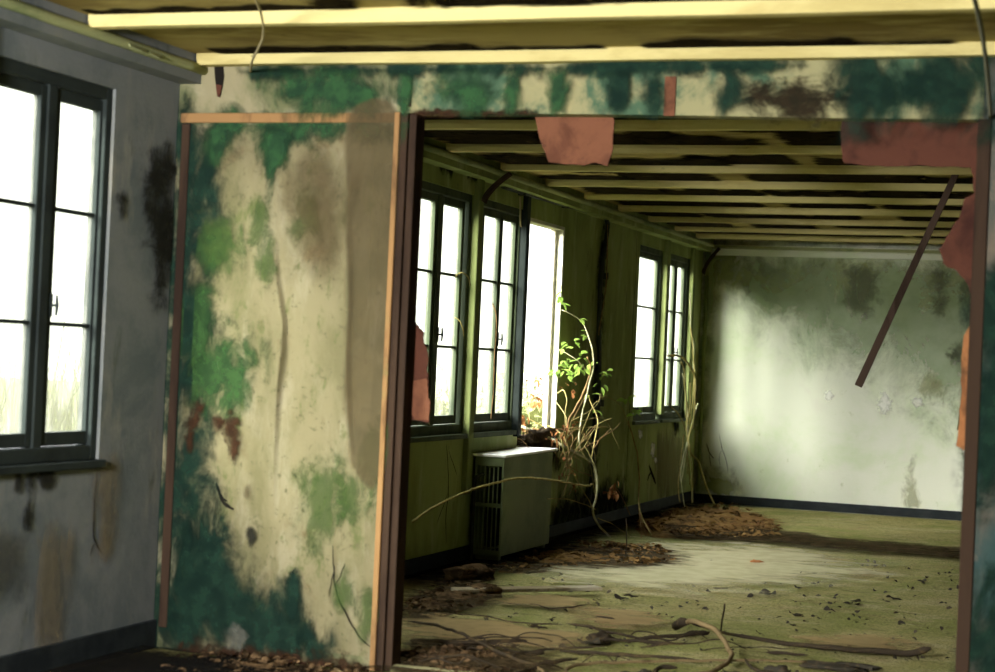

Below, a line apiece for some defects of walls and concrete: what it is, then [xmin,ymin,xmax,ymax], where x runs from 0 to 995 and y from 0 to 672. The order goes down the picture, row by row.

water stain [82,0,360,15]
water stain [405,0,730,8]
water stain [640,37,957,48]
water stain [143,44,995,662]